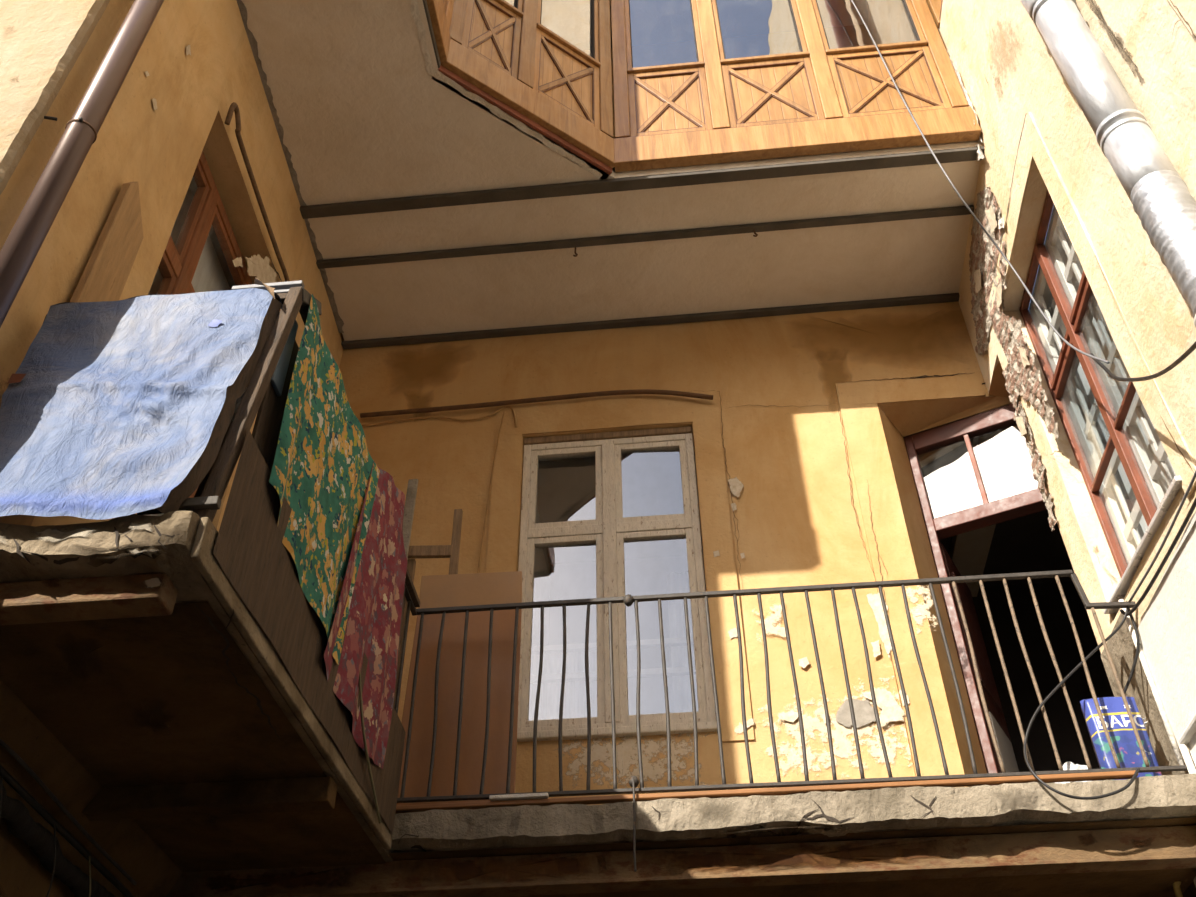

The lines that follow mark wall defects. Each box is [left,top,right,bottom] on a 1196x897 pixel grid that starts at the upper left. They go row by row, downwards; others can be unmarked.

peeling [232,251,282,283]
flaking render [969,187,1059,530]
leakage [823,361,847,395]
crack [694,373,972,617]
spalling [86,544,159,563]
peeling [866,593,892,658]
peeling [781,710,798,722]
peeling [821,688,910,728]
crack [795,801,842,832]
crack [910,795,936,818]